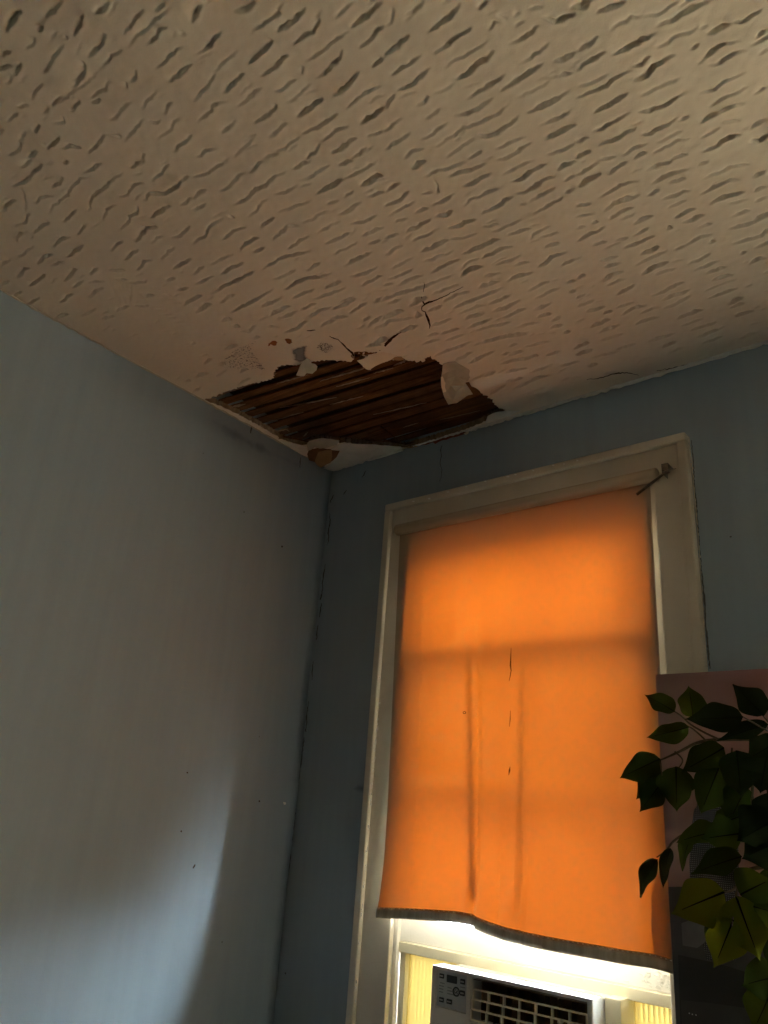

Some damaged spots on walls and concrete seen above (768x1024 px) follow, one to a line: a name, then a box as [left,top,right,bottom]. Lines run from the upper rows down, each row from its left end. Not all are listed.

crack [421,284,462,329]
peeling [296,359,318,376]
crack [307,330,401,356]
peeling [357,352,404,370]
peeling [441,362,481,405]
peeling [278,430,469,471]